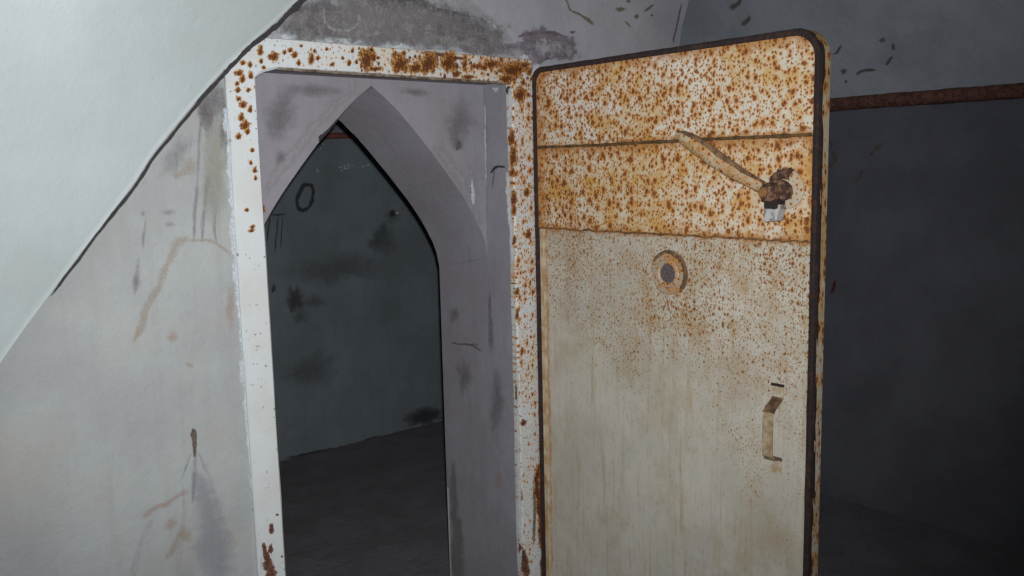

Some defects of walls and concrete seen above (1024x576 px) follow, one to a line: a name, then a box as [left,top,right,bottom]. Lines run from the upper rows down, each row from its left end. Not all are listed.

corrosion [233,17,841,576]